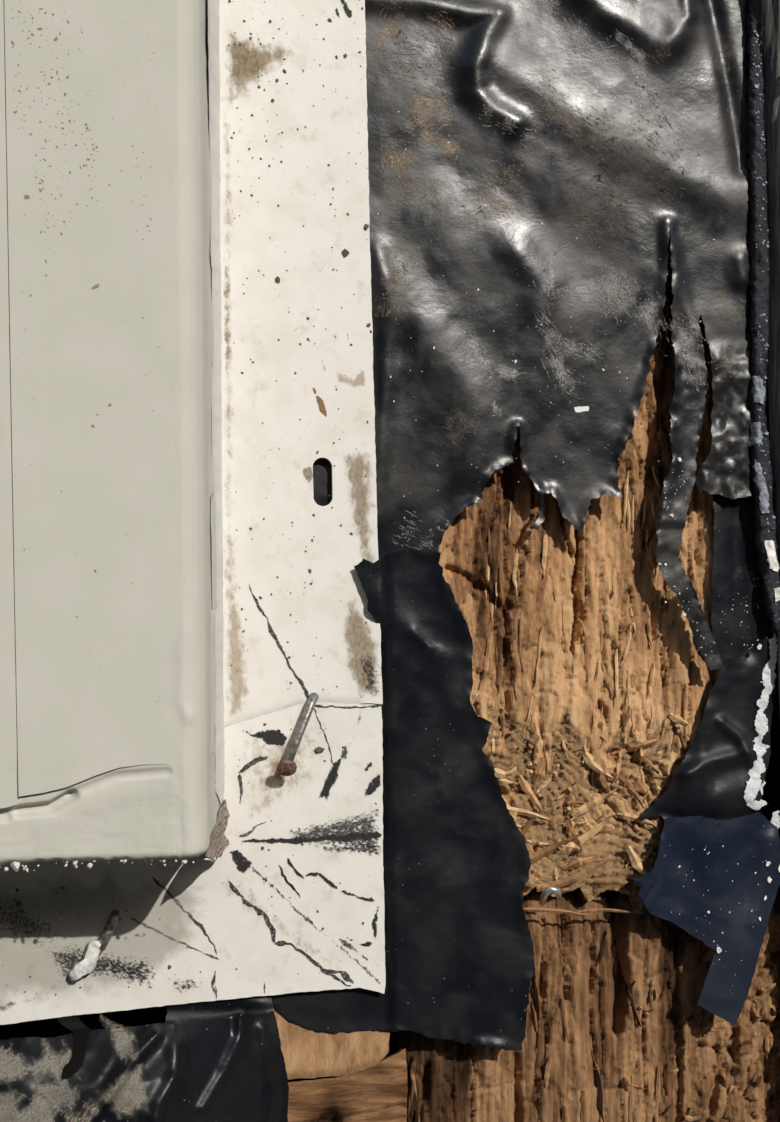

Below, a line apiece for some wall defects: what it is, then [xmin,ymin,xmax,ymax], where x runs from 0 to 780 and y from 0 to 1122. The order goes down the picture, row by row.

leakage [231,47,241,75]
peeling [746,781,780,828]